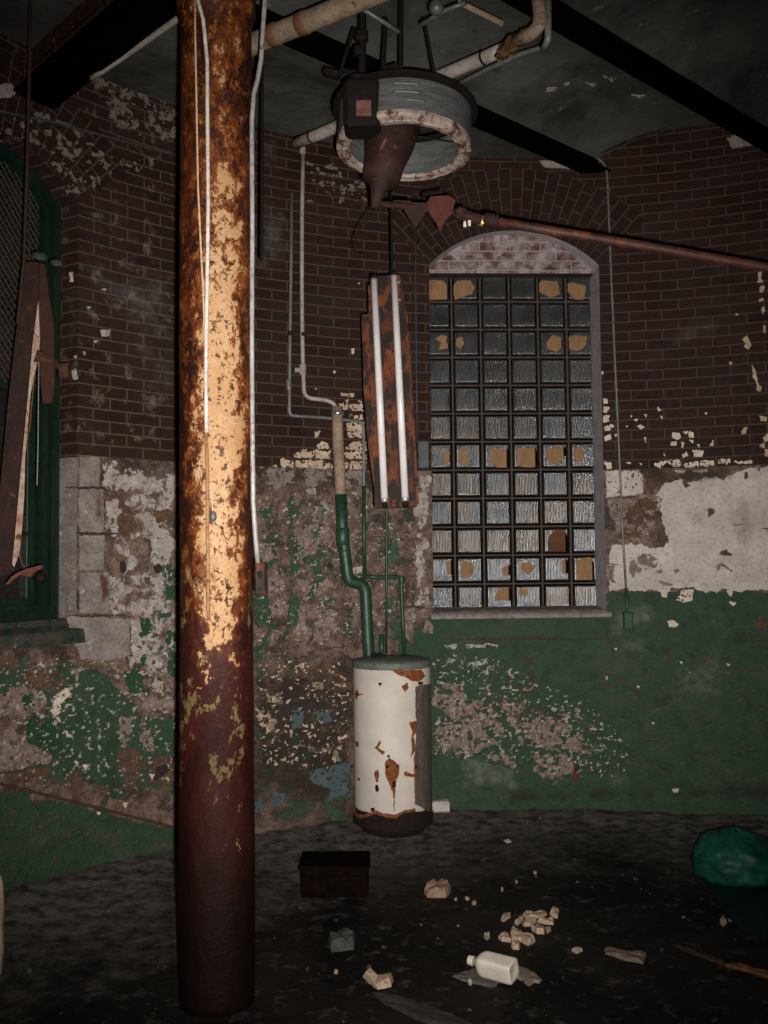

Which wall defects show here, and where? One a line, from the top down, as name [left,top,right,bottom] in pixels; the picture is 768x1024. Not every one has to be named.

peeling [0,112,159,196]
peeling [95,78,179,142]
peeling [603,398,663,442]
spalling [0,460,180,808]
peeling [253,393,435,813]
peeling [431,615,768,793]
peeling [604,431,768,606]